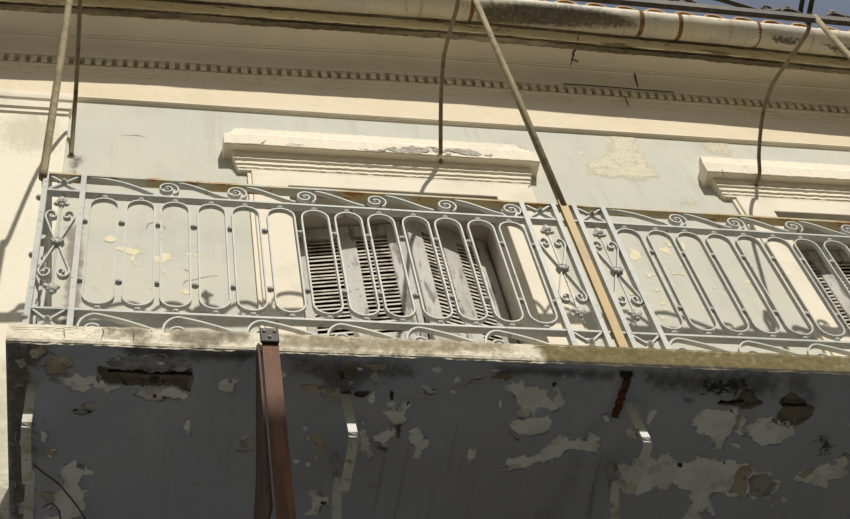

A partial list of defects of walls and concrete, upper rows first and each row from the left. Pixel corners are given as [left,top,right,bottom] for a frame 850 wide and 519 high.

spalling [47,352,194,417]
peeling [299,363,387,404]
peeling [358,378,438,462]
peeling [450,368,602,472]
rust [611,371,633,418]
mould [702,378,748,395]
peeling [39,459,94,519]
peeling [616,388,815,519]
peeling [793,453,850,492]